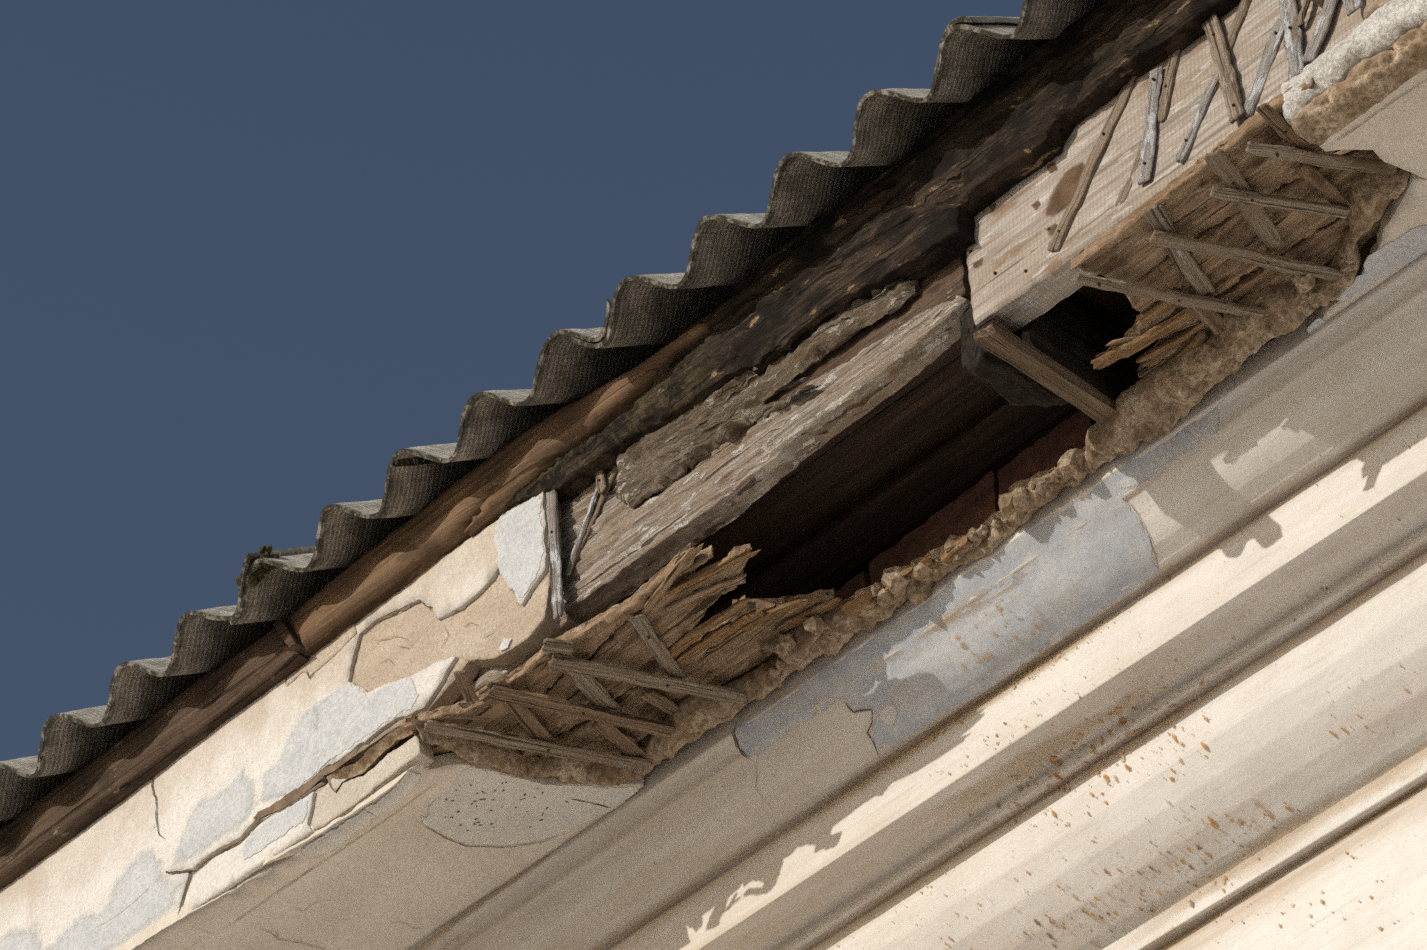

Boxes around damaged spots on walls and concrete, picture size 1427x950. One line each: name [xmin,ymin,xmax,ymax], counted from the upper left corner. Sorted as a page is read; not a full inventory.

peeling [174,167,1427,863]
corrosion [955,562,1186,708]
peeling [0,851,178,950]
crack [99,746,564,950]
corrosion [944,649,1232,874]
corrosion [1005,800,1387,950]